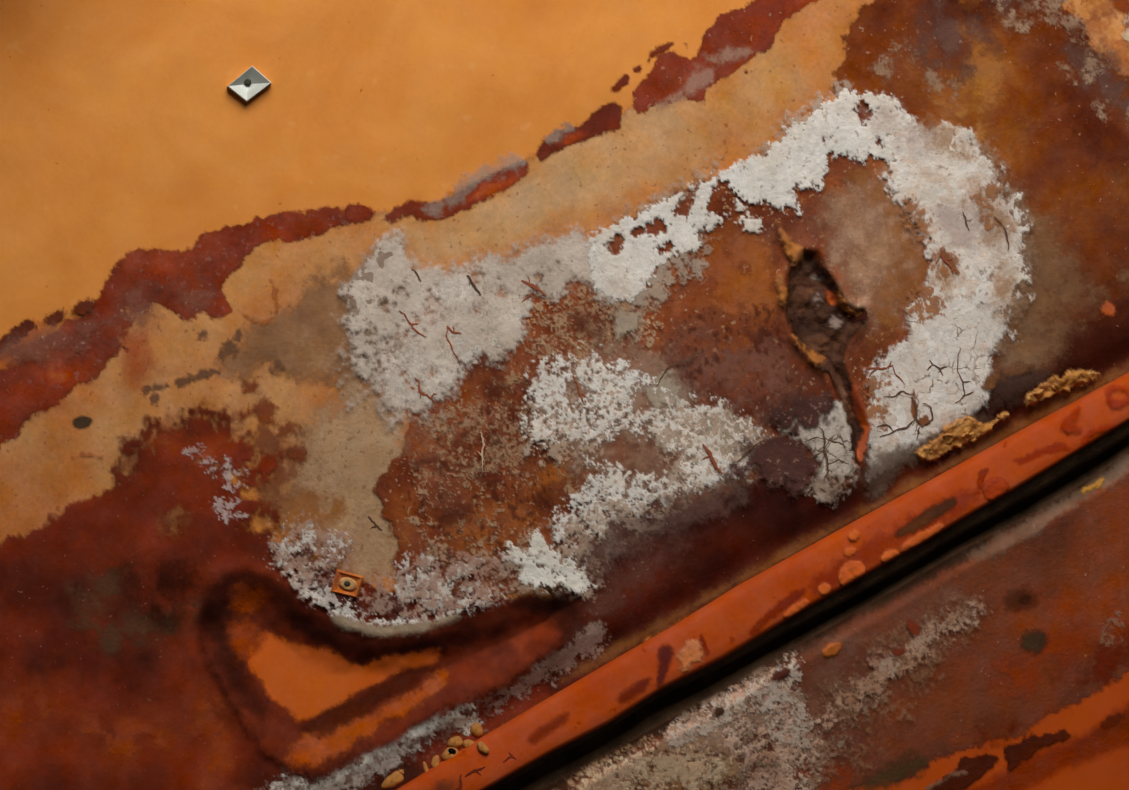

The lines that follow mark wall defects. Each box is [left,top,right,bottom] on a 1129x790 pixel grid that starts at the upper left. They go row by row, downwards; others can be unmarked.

corrosion [0,0,817,444]
leakage [219,80,1035,638]
corrosion [336,0,1129,790]
spalling [775,221,871,462]
crack [866,348,974,439]
crack [936,251,954,273]
crack [963,212,1009,250]
corrosion [0,405,428,790]
leakage [264,621,607,790]
leakage [568,596,992,790]
peeling [926,729,1071,790]